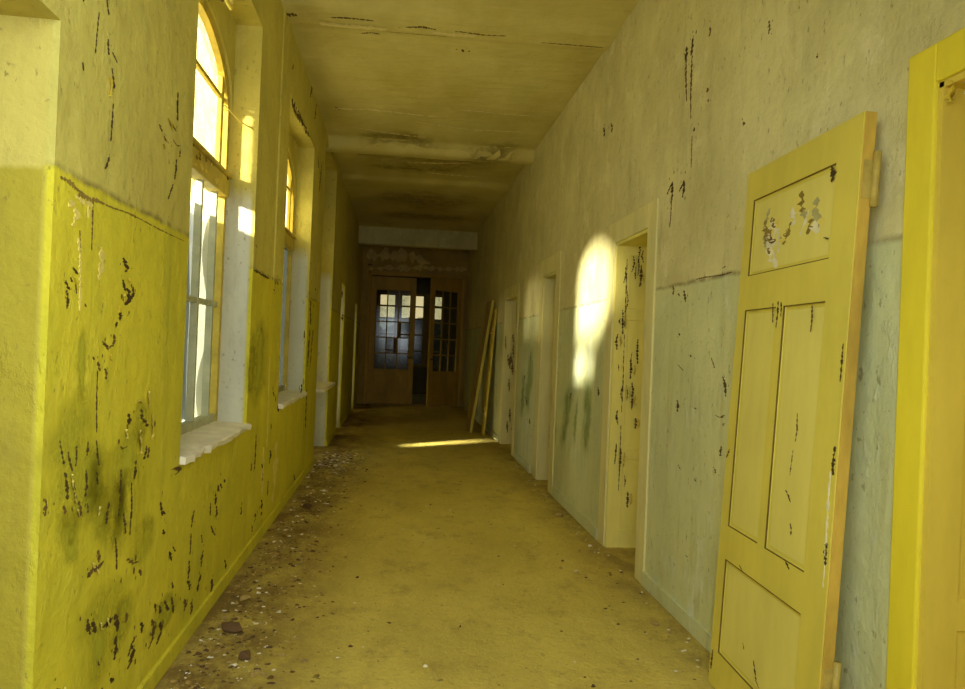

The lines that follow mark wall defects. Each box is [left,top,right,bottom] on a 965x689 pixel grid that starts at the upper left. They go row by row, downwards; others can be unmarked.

peeling [159,93,181,199]
spalling [667,27,711,227]
peeling [43,258,156,583]
damp [54,407,147,560]
peeling [80,475,226,669]
damp [248,328,264,395]
peeling [614,247,645,507]